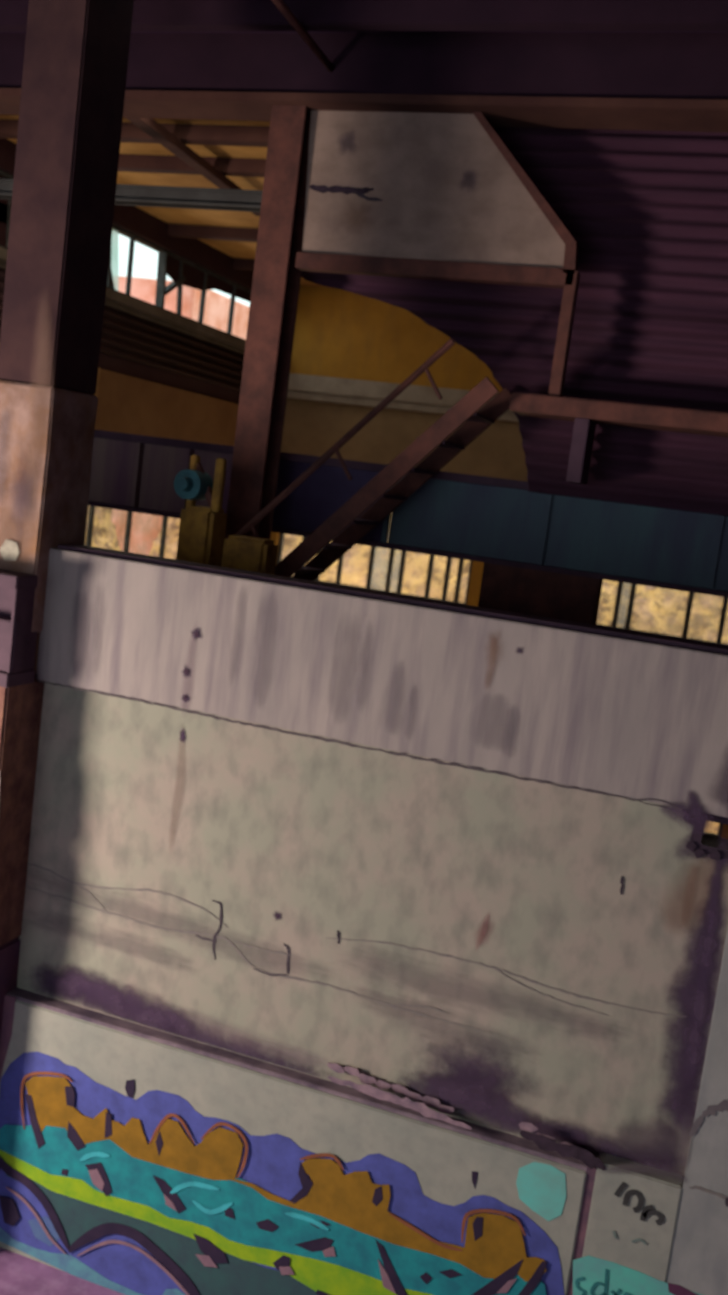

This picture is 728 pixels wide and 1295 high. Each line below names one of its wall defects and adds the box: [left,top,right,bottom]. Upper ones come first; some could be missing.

damp [406,1078,569,1143]